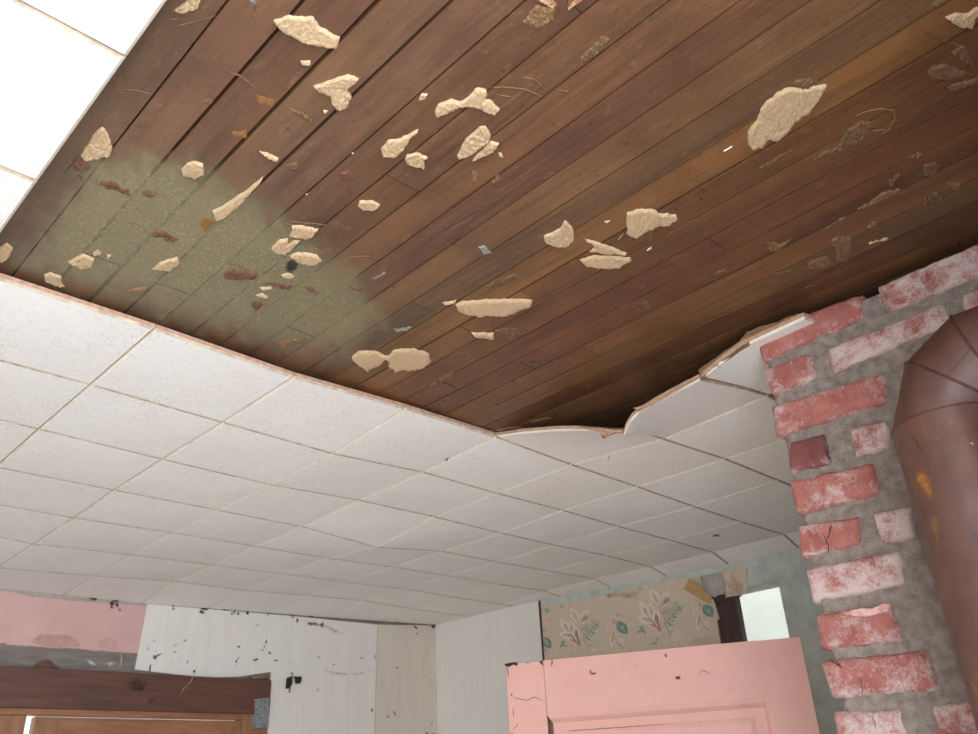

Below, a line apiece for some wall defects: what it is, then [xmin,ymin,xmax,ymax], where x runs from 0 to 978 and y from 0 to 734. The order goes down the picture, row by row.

peeling [0,590,147,669]